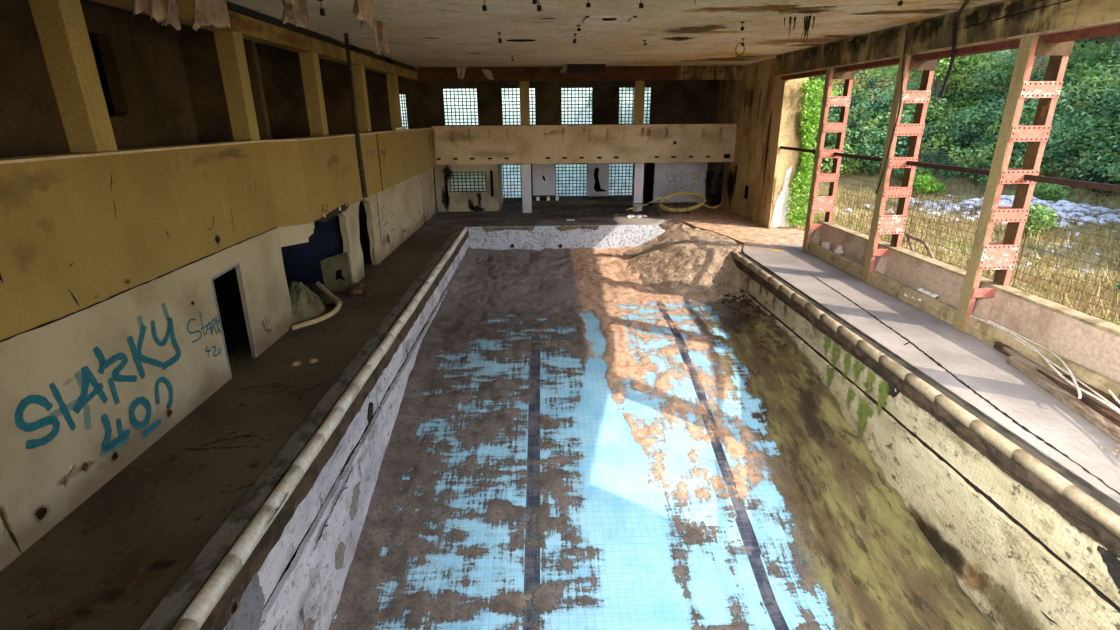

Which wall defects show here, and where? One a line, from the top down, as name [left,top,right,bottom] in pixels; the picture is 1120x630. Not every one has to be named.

water stain [662,0,1048,62]
spalling [316,202,349,223]
water stain [826,344,888,414]
crack [808,272,1120,494]
spalling [364,402,374,425]
crack [0,515,22,554]
spalling [1087,546,1120,594]
spalling [223,573,265,630]